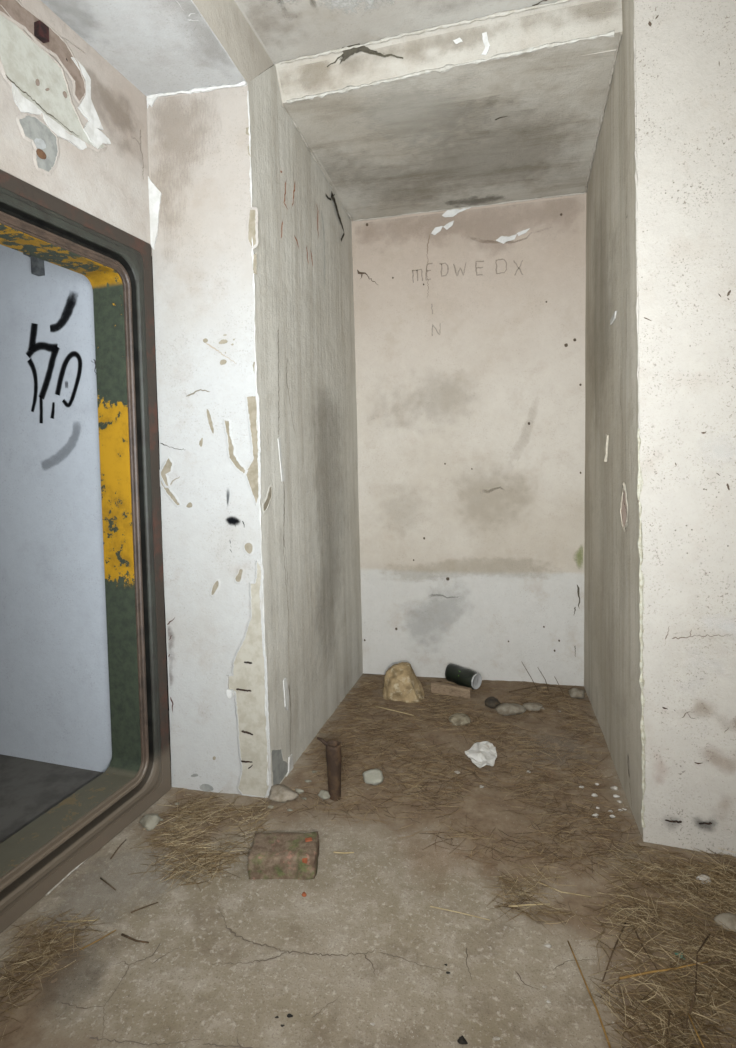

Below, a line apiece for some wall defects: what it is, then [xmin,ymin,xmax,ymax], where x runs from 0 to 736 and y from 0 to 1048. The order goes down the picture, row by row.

peeling [0,0,111,175]
peeling [431,207,471,235]
peeling [496,228,530,244]
peeling [159,455,192,508]
peeling [199,393,273,515]
spalling [209,540,293,798]
crack [213,906,472,979]
crack [61,944,252,1048]